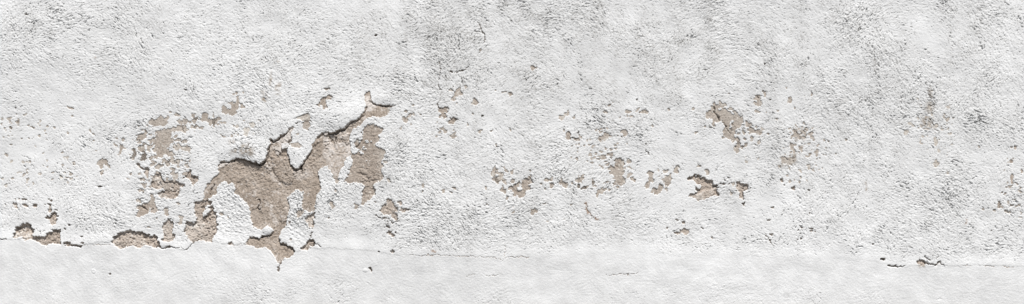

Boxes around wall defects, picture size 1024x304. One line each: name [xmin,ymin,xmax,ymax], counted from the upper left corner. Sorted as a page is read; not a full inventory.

flaking render [1,113,84,248]
flaking render [89,88,421,263]
peeling [485,99,748,213]
peeling [691,87,836,191]